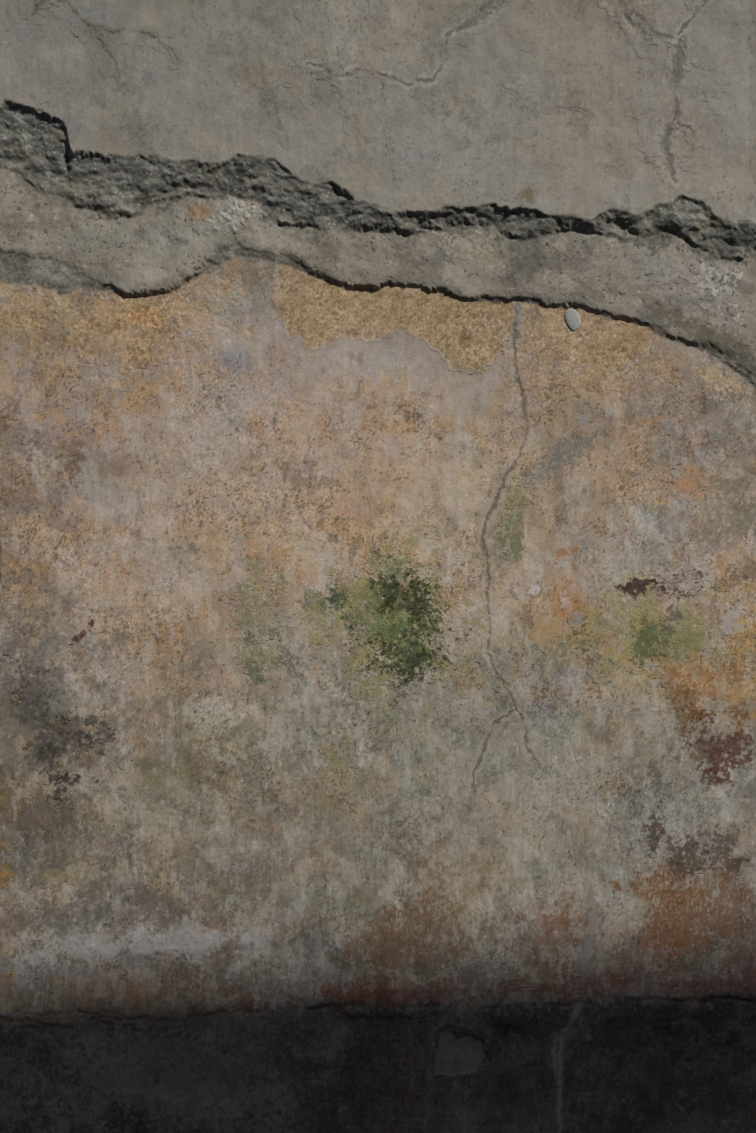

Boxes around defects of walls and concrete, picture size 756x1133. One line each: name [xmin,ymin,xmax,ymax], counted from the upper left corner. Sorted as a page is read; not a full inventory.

crack [18,0,186,93]
crack [288,0,511,99]
crack [498,82,596,117]
crack [597,0,705,198]
crack [748,0,756,201]
flaking render [0,102,756,261]
spalling [0,242,756,402]
crack [462,292,554,810]